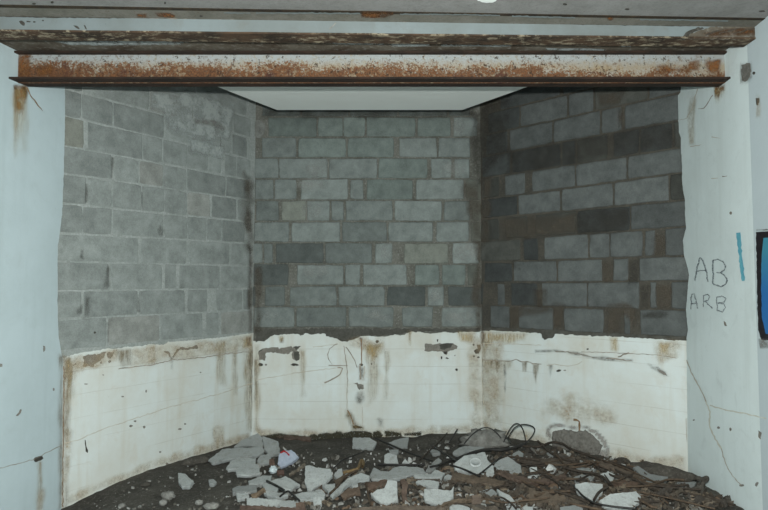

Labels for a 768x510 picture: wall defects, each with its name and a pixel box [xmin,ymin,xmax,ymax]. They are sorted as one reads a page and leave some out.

rust [18,55,52,76]
rust [659,60,720,73]
spalling [741,63,755,82]
rust [14,86,27,111]
peeling [73,352,114,367]
spalling [258,346,301,366]
spalling [424,339,458,359]
peeling [473,344,581,374]
crack [3,339,365,468]
crack [591,352,766,485]
water stain [60,357,71,507]